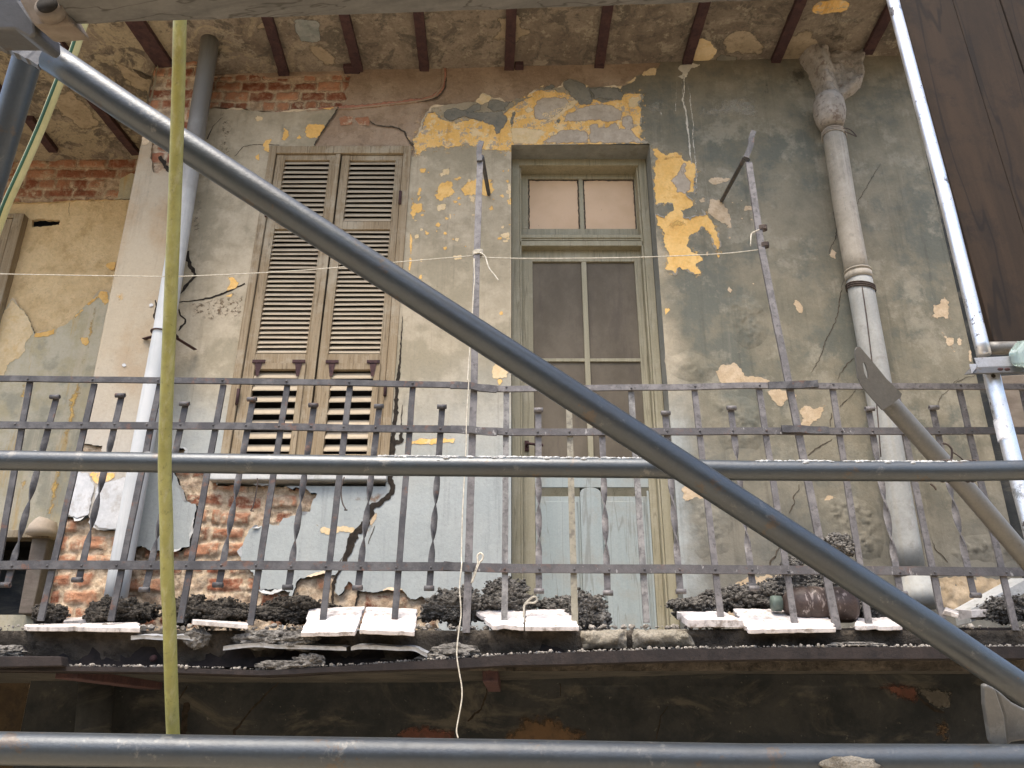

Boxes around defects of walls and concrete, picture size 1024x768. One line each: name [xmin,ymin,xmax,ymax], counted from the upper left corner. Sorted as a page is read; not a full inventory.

peeling [408,67,752,281]
damp [675,63,700,193]
peeling [0,300,54,375]
crack [153,251,245,331]
peeling [492,364,508,385]
peeling [716,363,826,426]
crack [808,281,855,455]
peeling [932,297,952,320]
crack [331,316,404,606]
flaking render [50,472,125,618]
flaking render [128,547,163,631]
flaking render [174,473,317,606]